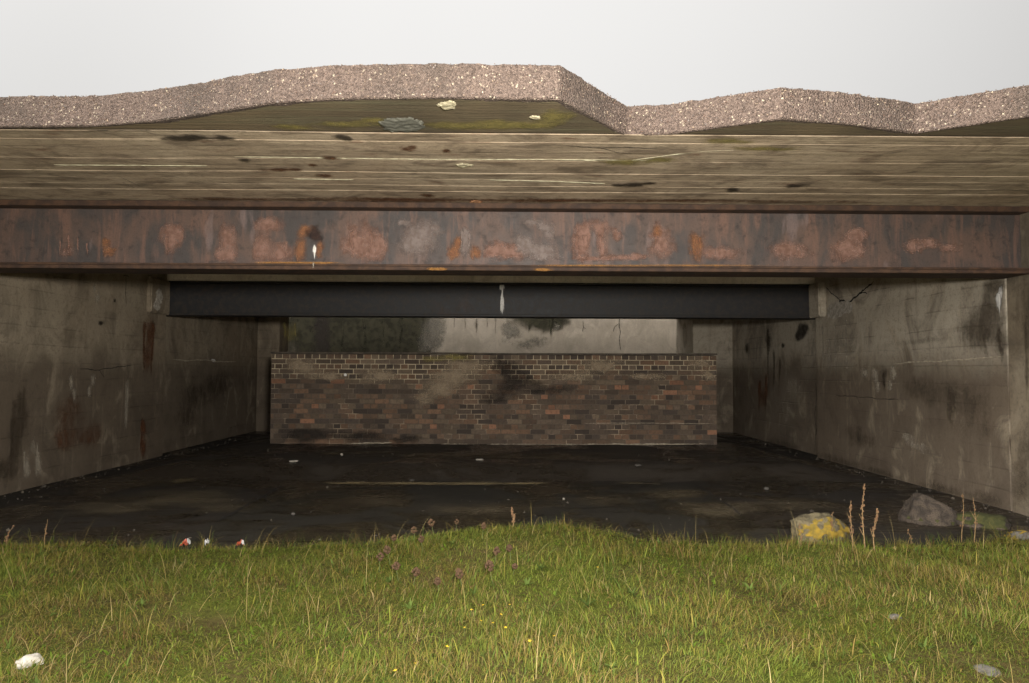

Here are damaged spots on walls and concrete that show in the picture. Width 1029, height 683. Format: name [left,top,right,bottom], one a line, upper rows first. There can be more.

corrosion [184,194,754,202]
corrosion [215,226,237,263]
corrosion [428,220,747,271]
corrosion [834,228,867,262]
crack [827,281,874,302]
damp [964,280,1004,350]
damp [495,318,569,347]